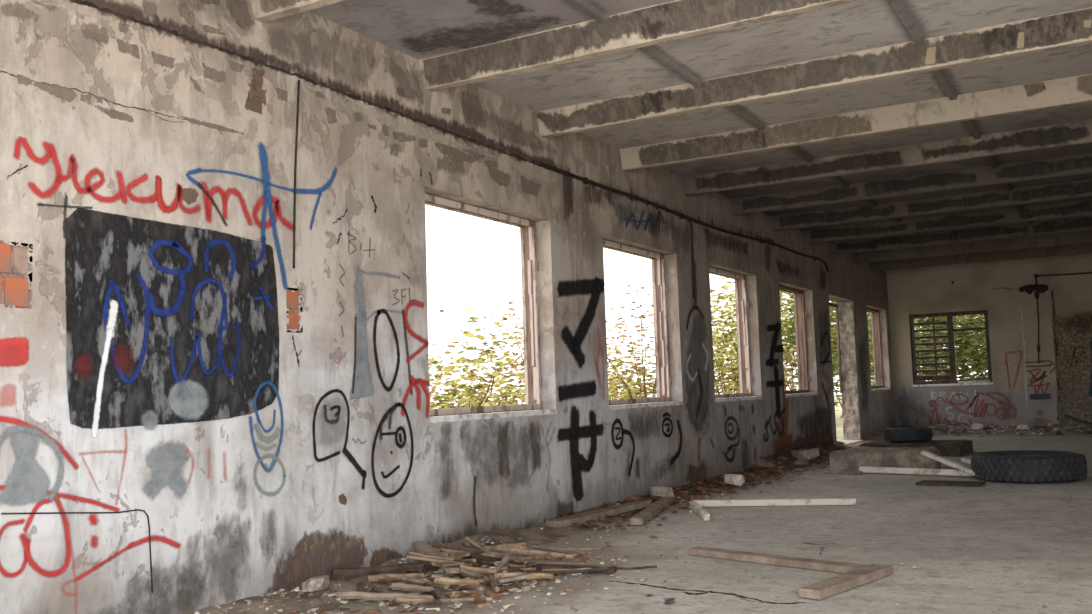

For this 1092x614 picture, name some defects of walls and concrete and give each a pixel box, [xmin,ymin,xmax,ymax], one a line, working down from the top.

crack [0,70,186,123]
crack [71,0,560,174]
flaking render [306,85,556,196]
flaking render [0,241,33,309]
flaking render [286,288,303,333]
water stain [131,526,244,614]
water stain [267,531,402,593]